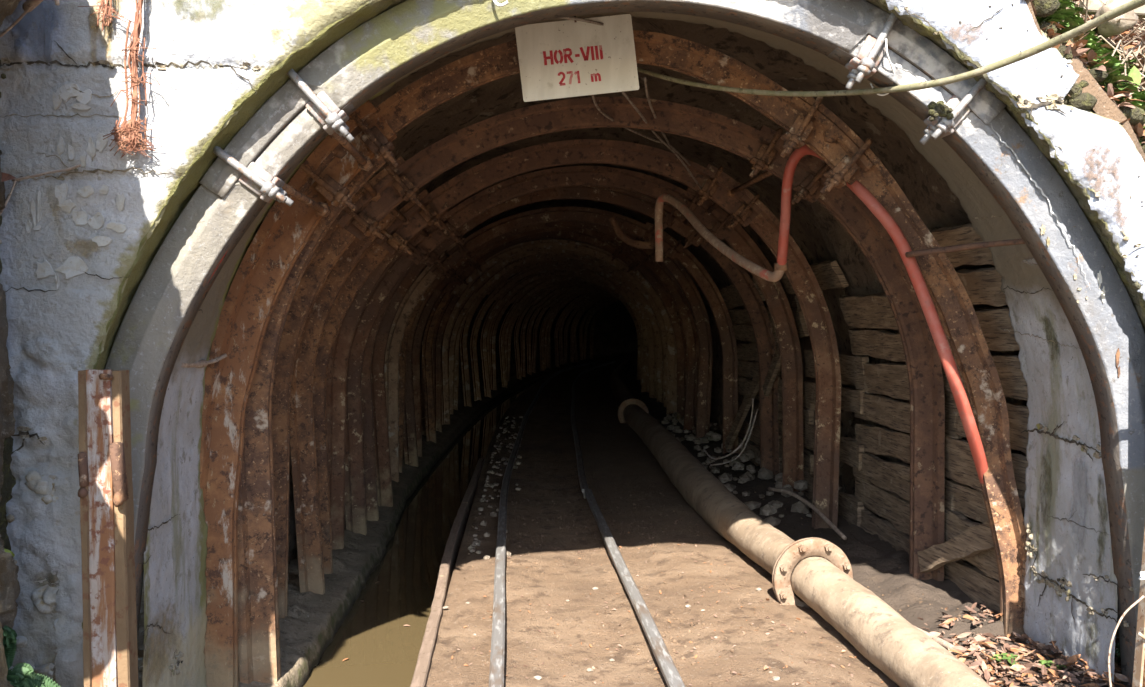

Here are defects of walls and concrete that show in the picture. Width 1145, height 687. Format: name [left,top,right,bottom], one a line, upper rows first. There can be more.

peeling [53,83,92,110]
crack [0,41,260,119]
crack [5,152,185,202]
peeling [55,183,128,247]
peeling [36,256,88,291]
crack [1021,422,1101,461]
crack [1029,544,1134,631]